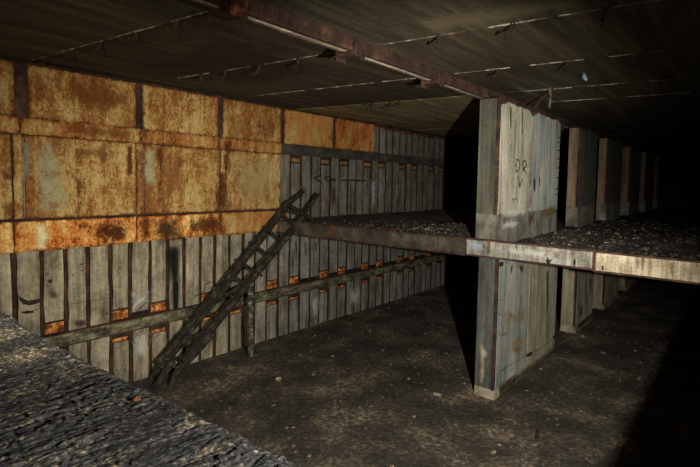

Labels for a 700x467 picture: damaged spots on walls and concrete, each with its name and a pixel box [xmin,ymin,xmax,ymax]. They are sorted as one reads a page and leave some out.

rust [0,60,375,254]
damp [168,247,179,309]